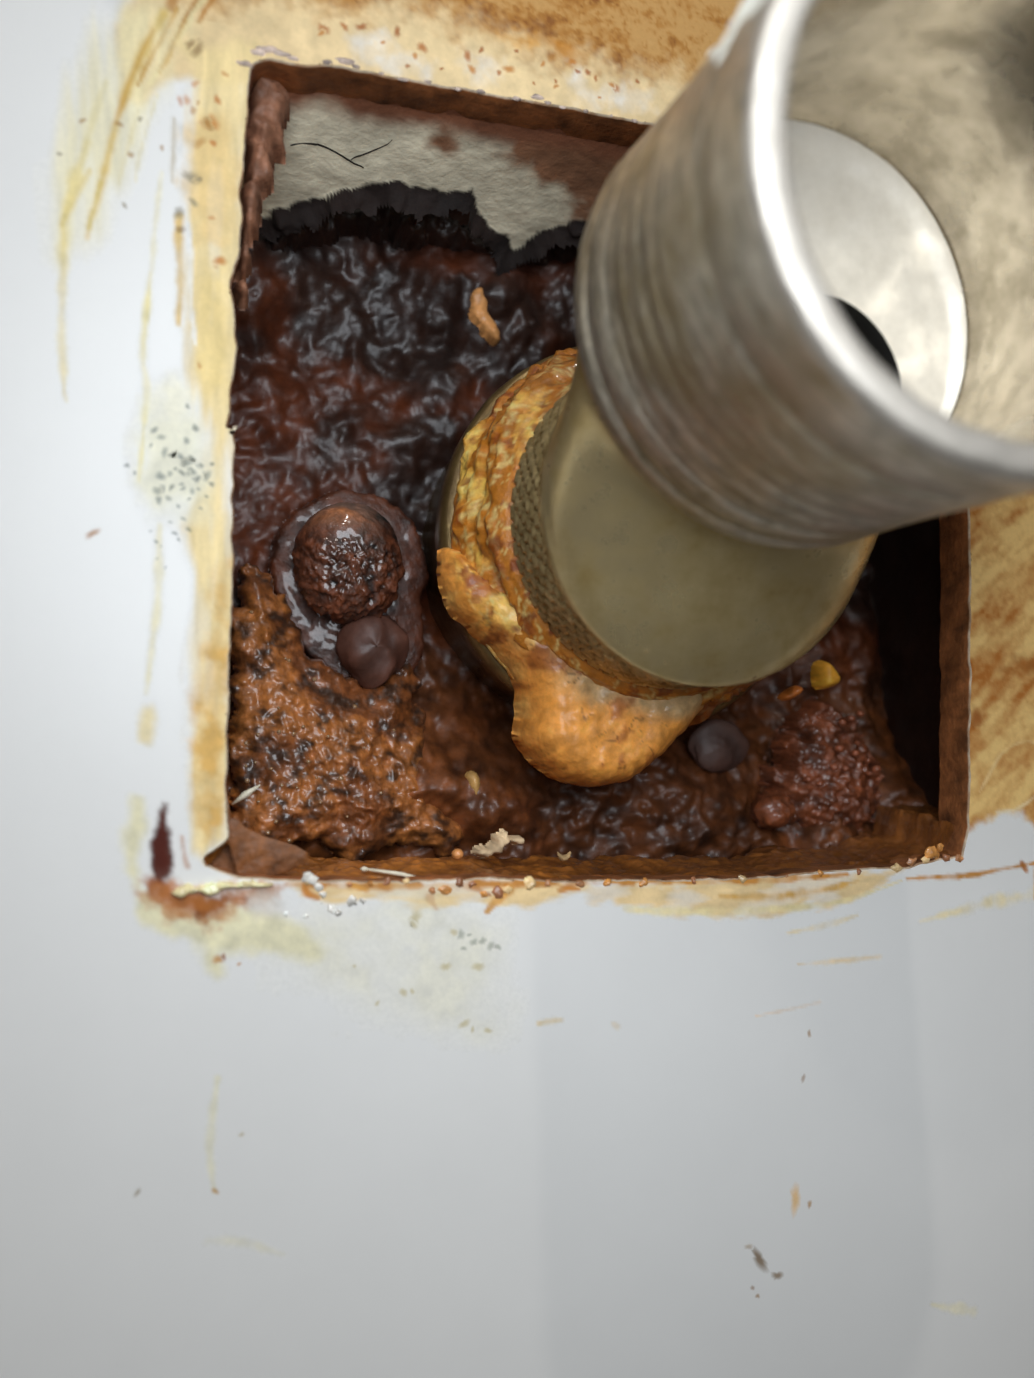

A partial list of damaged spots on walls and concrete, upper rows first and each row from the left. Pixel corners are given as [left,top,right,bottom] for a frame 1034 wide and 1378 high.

peeling [236,45,299,68]
rust [31,0,742,984]
peeling [810,660,840,690]
rust [968,493,1034,835]
rust [688,685,885,837]
peeling [171,879,273,899]
peeling [301,871,366,916]
rust [428,843,1034,937]